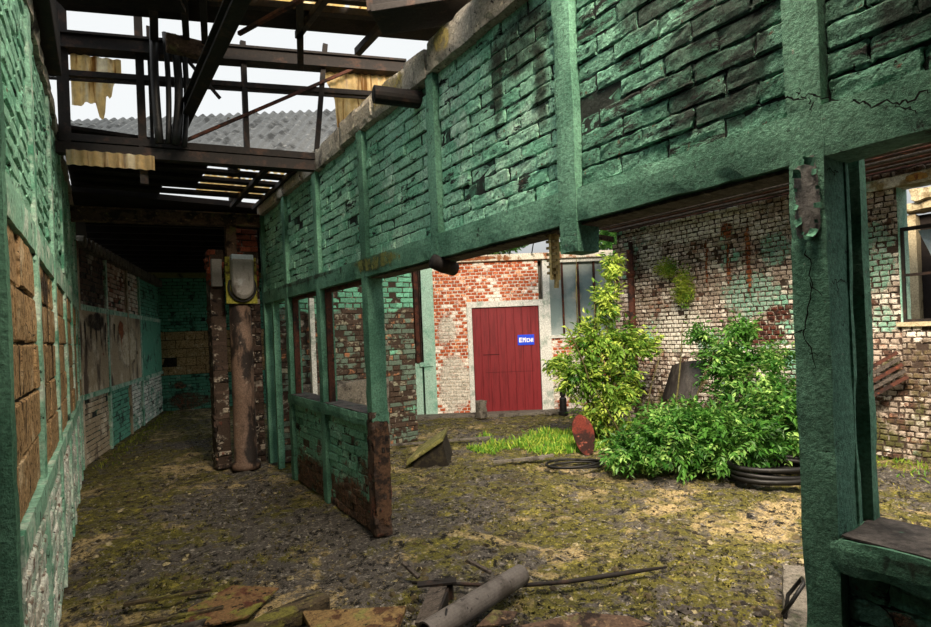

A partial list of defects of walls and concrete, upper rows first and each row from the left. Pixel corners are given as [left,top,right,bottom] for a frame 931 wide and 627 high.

leakage [490,7,548,123]
crack [785,87,931,114]
corrosion [744,223,752,295]
peeling [722,271,790,354]
peeling [747,155,822,266]
crack [793,251,848,378]